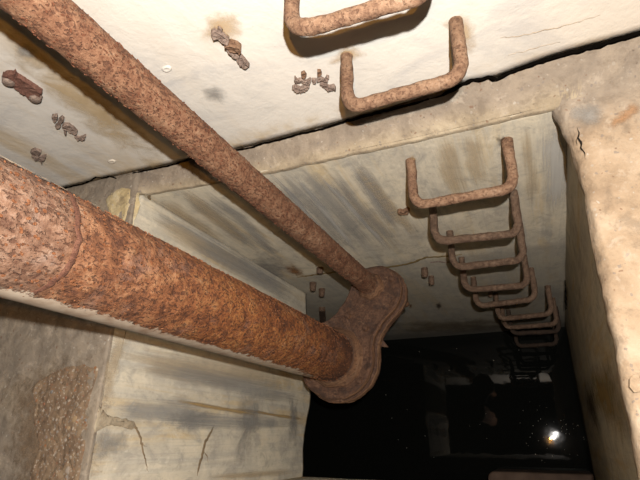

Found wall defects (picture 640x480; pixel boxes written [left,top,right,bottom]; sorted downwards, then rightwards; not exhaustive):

crack [62,158,193,189]
corrosion [61,1,376,294]
crack [235,31,640,151]
spalling [15,364,135,480]
crack [133,421,147,466]
crack [197,426,214,476]